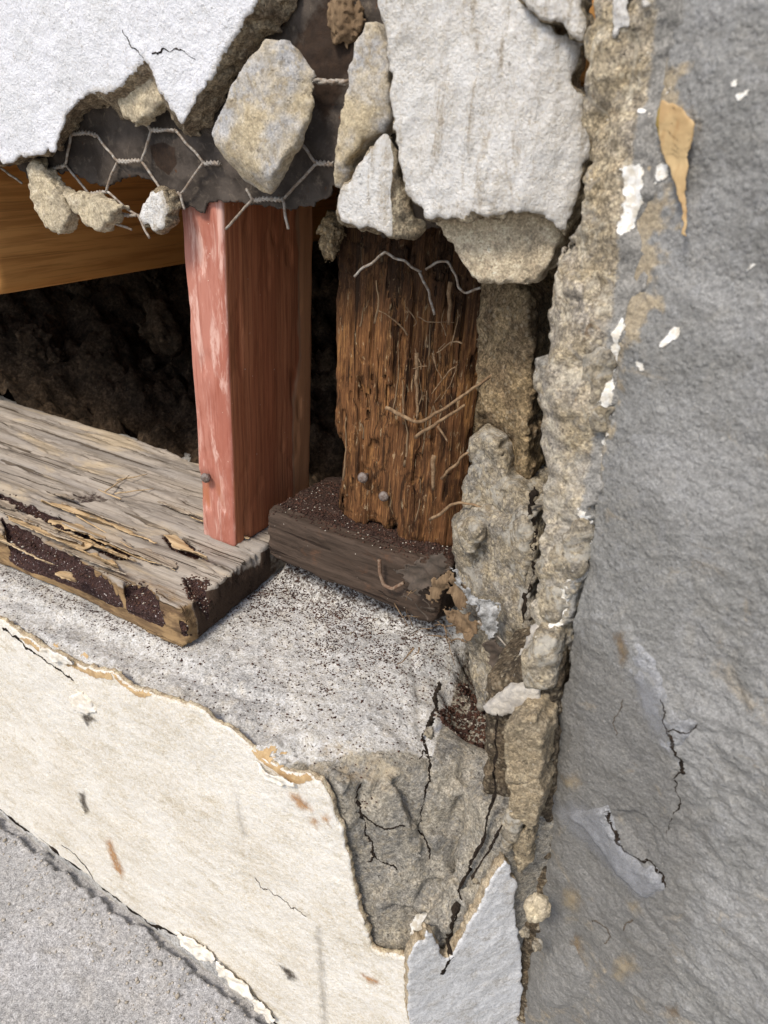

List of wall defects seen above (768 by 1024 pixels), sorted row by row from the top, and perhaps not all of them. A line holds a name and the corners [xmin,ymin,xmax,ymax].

crack [122,30,195,59]
peeling [654,163,668,184]
peeling [597,376,616,407]
spalling [483,682,541,717]
crack [355,682,442,870]
crack [660,699,697,833]
spalling [246,738,554,951]
crack [440,714,503,975]
crack [604,811,666,887]